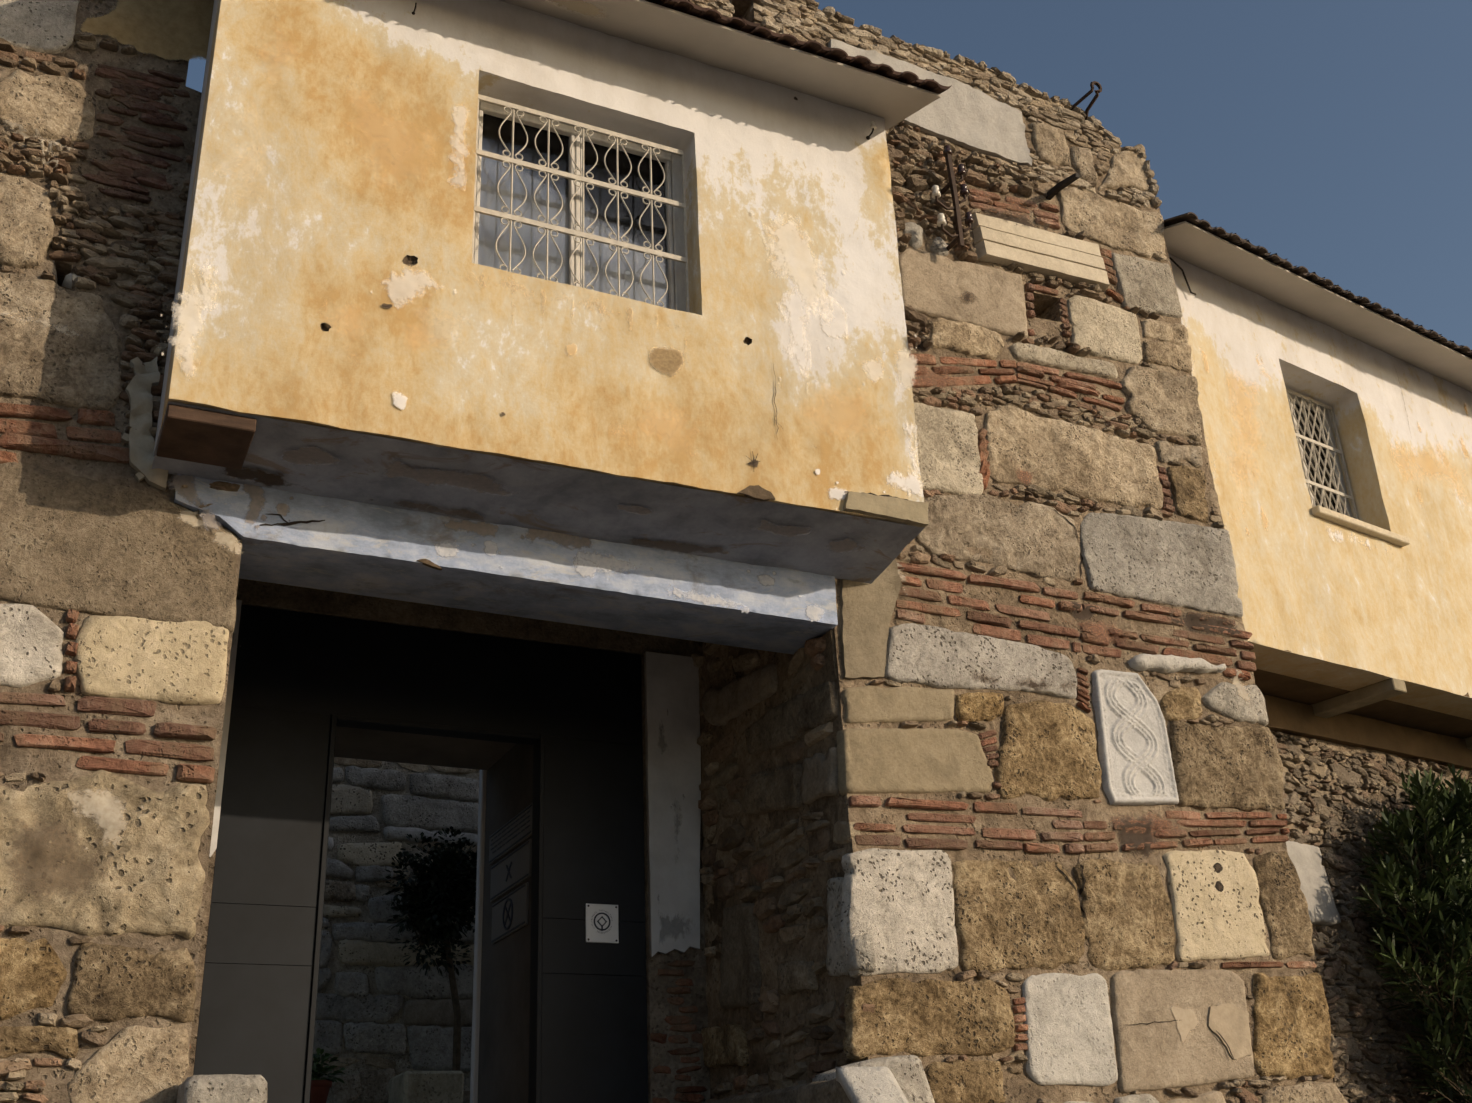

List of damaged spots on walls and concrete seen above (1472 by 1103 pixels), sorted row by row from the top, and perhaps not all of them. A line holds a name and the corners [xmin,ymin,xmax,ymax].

peeling [371,255,436,308]
peeling [863,351,916,387]
spalling [392,392,408,410]
crack [773,365,783,439]
water stain [225,467,296,487]
peeling [815,469,847,510]
peeling [883,423,922,501]
crack [260,513,325,526]